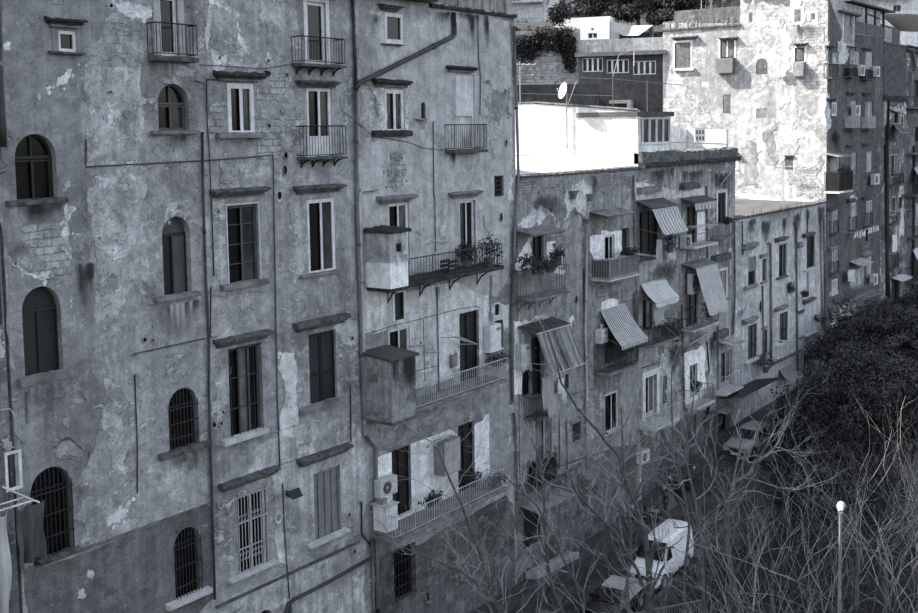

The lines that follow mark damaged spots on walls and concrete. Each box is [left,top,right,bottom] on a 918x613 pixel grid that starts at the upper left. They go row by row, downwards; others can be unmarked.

flaking render [109,0,153,23]
flaking render [204,0,249,71]
flaking render [743,0,849,110]
flaking render [824,92,832,132]
flaking render [735,118,825,202]
flaking render [3,62,148,335]
flaking render [513,171,635,228]
leakage [79,263,94,297]
flaking render [277,351,301,438]